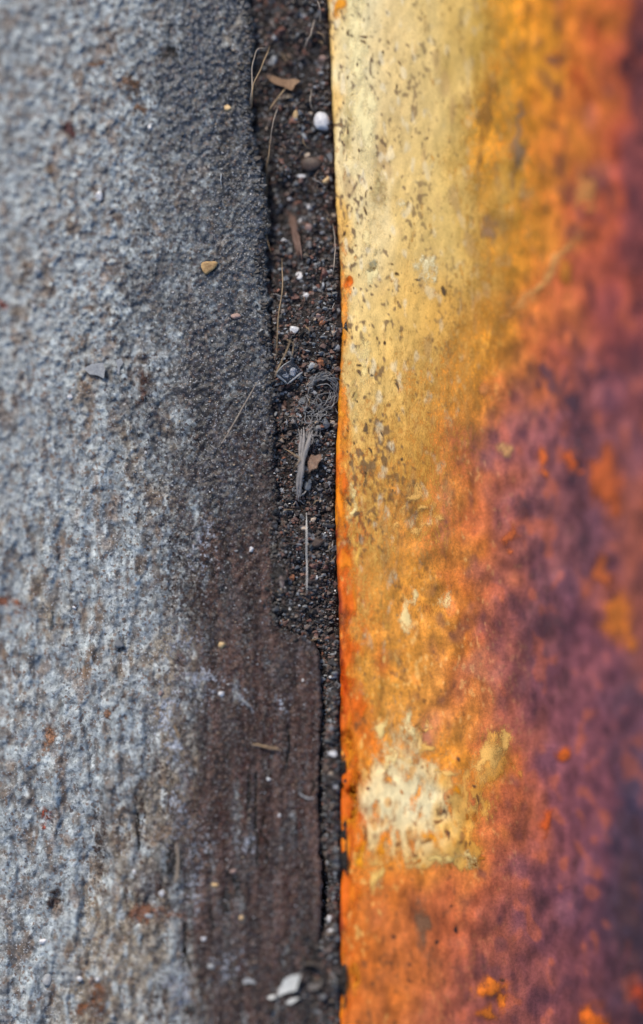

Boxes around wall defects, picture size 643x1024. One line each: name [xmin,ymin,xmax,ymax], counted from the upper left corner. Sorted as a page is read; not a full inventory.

rust [575,173,596,212]
rust [541,364,580,412]
water stain [105,0,279,925]
rust [539,448,549,477]
rust [563,425,623,517]
rust [592,554,637,652]
rust [335,380,367,1020]
rust [557,748,570,762]
rust [476,976,506,1019]
rust [580,1006,604,1024]